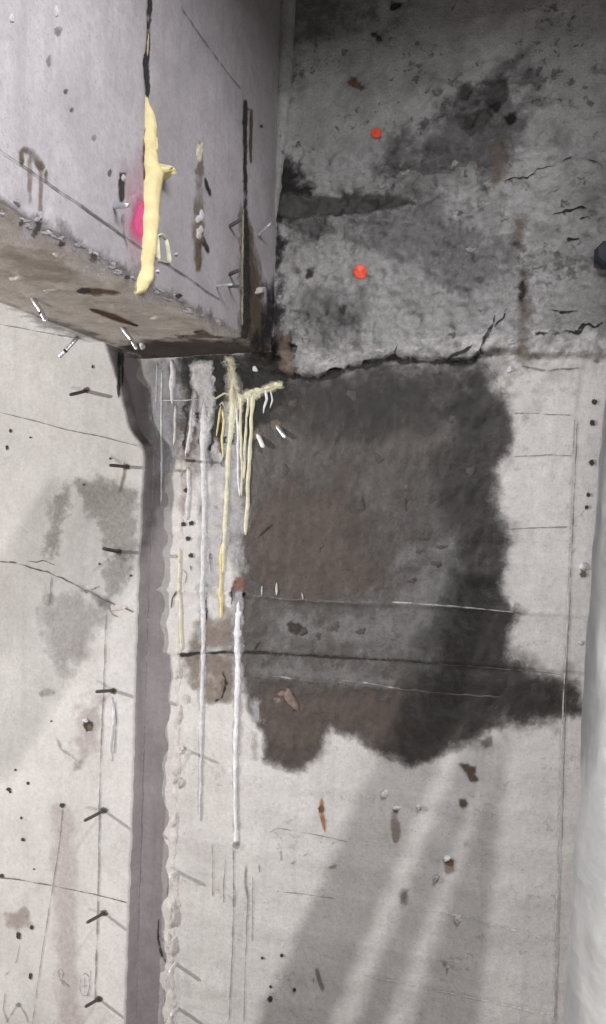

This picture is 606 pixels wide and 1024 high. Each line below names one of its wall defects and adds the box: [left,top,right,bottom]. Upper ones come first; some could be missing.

crack [505,157,598,182]
crack [554,206,588,241]
leakage [518,277,606,365]
crack [535,309,602,336]
crack [291,309,507,381]
crack [523,364,578,372]
leakage [28,141,582,845]
rust [318,799,326,831]